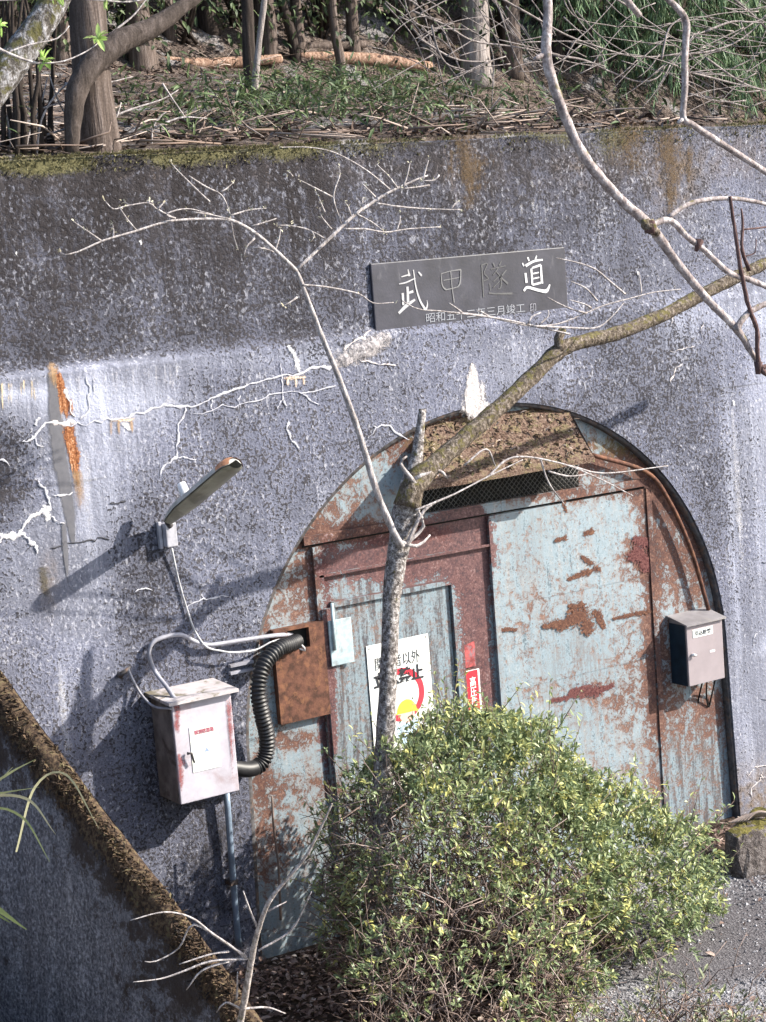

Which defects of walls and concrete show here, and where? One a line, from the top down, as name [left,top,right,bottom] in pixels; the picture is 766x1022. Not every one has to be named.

crack [22,330,396,476]
rust [48,363,82,580]
crack [0,481,110,554]
rust [567,555,602,582]
rust [625,535,650,573]
rust [542,601,652,637]
rust [551,681,615,703]
crack [748,765,766,796]